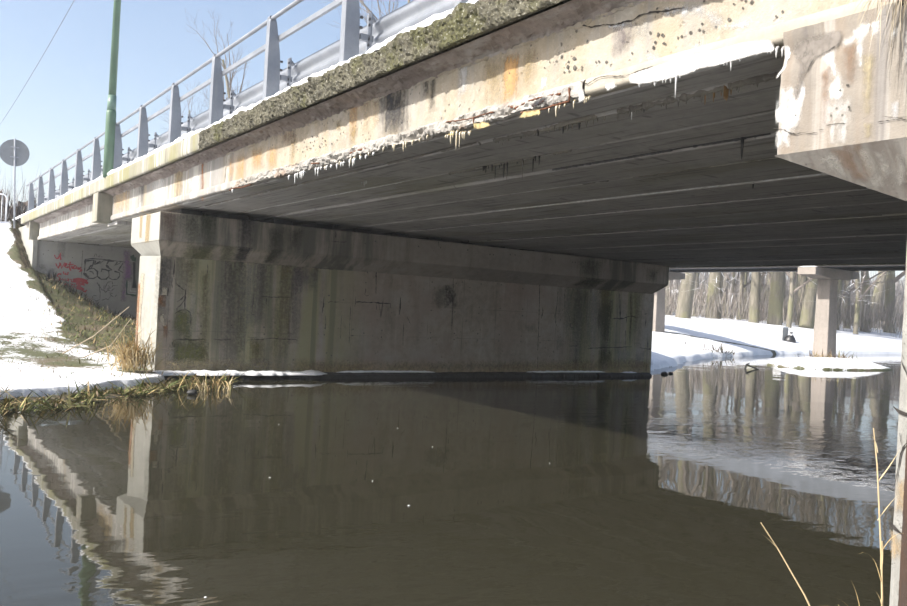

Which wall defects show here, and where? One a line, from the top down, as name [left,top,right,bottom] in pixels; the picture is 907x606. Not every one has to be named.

crack [583,7,684,28]
rust [504,56,518,96]
water stain [617,41,791,120]
spalling [794,31,842,96]
water stain [825,51,842,98]
water stain [850,22,878,65]
water stain [381,90,405,131]
spalling [229,55,586,191]
water stain [552,87,804,171]
crack [774,123,845,135]
water stain [159,258,170,304]
water stain [167,339,268,371]